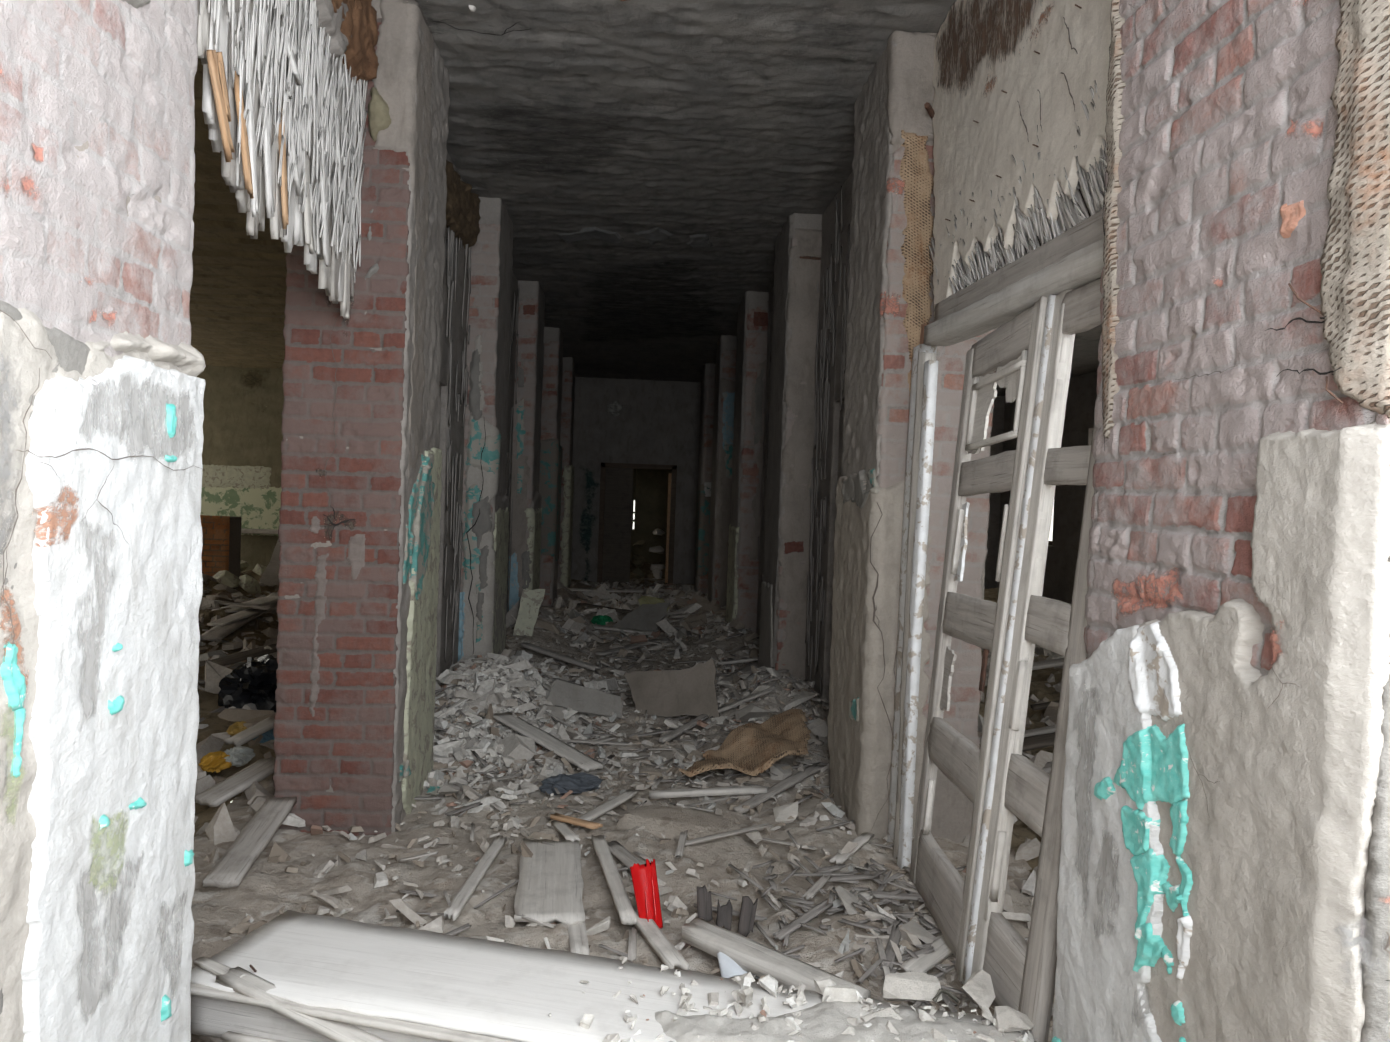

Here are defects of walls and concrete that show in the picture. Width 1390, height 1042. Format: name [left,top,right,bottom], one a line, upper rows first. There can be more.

peeling [308,0,352,58]
water stain [446,160,481,249]
flaking render [1279,200,1306,238]
peeling [165,403,177,438]
peeling [458,349,526,661]
peeling [0,642,26,778]
peeling [108,695,125,715]
peeling [1094,568,1193,979]
peeling [128,797,147,810]
peeling [184,849,194,867]
peeling [160,994,172,1022]
peeling [1170,1000,1186,1042]